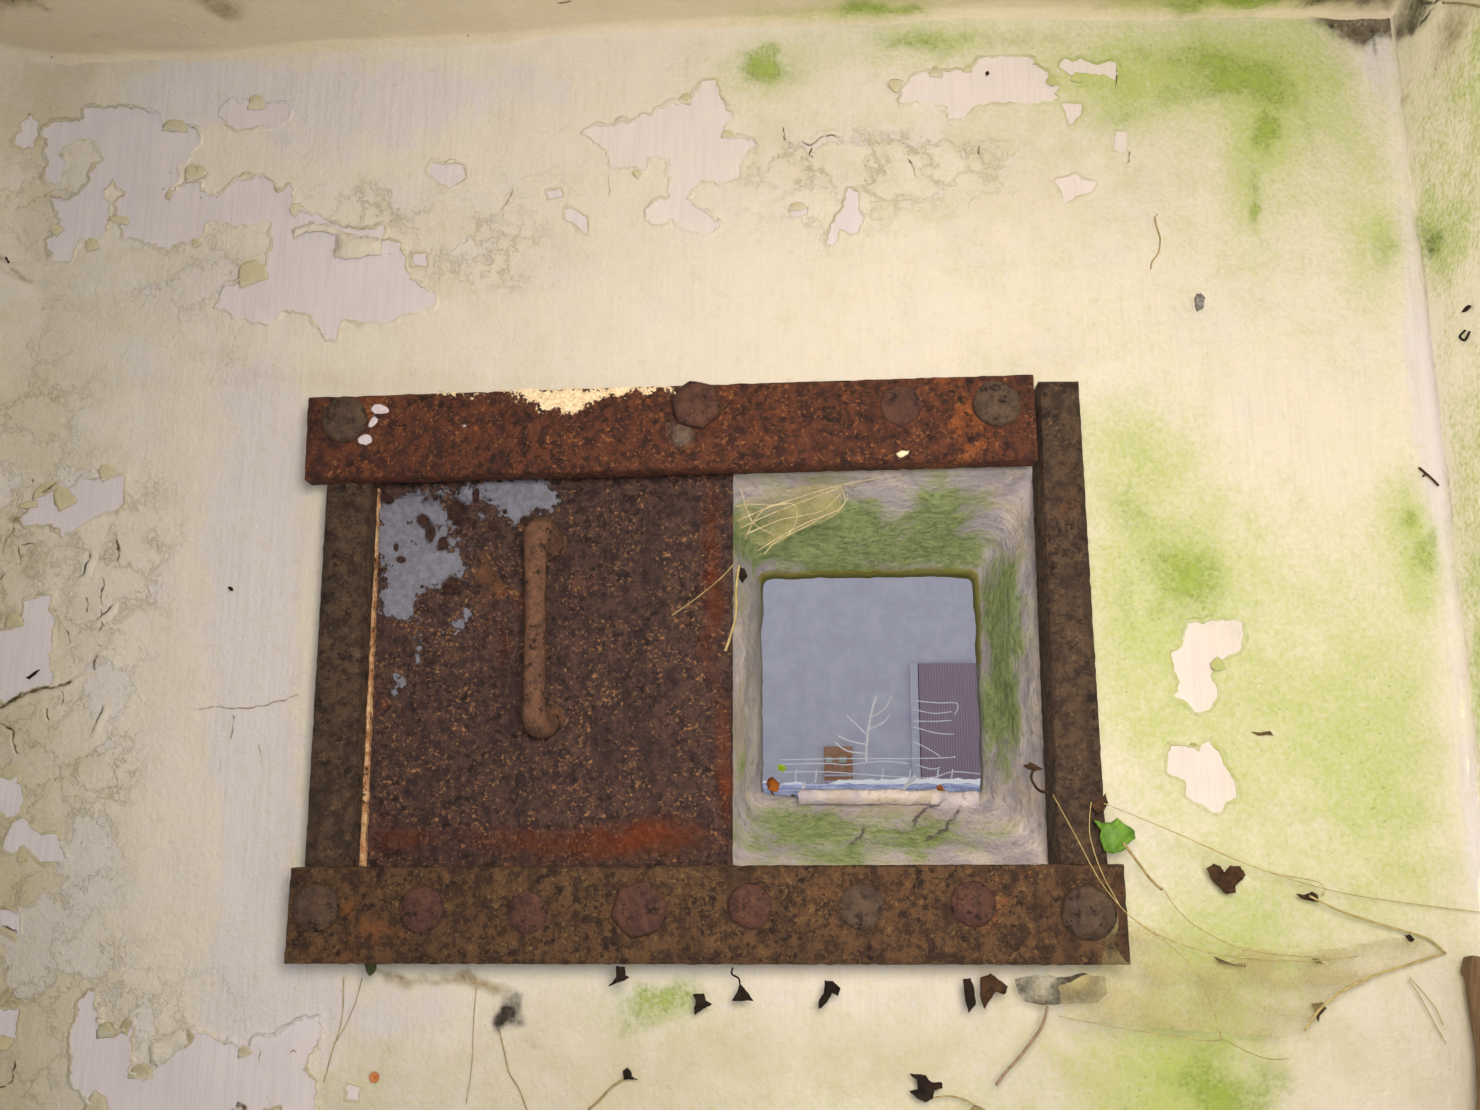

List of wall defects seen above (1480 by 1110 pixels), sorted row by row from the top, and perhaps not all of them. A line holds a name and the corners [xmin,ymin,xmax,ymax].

damp [1310,0,1439,44]
peeling [888,53,1123,129]
peeling [579,77,760,238]
peeling [9,102,440,344]
rust [380,492,395,504]
rust [377,543,406,576]
rust [442,576,458,594]
rust [417,488,531,551]
peeling [0,588,60,705]
peeling [1164,614,1249,717]
peeling [1162,736,1242,817]
peeling [66,987,325,1110]